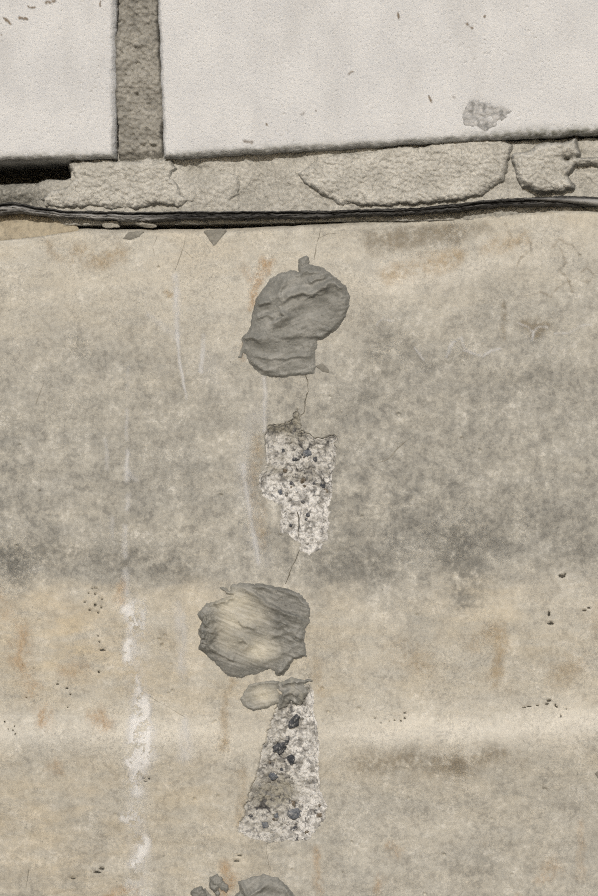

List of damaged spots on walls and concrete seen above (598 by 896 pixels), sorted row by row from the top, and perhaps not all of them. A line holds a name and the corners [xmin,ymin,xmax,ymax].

spalling [462,99,512,131]
spalling [0,214,79,240]
spalling [259,409,337,555]
efflorescence [121,603,145,662]
efflorescence [125,676,153,796]
spalling [237,684,328,843]
efflorescence [131,835,151,868]